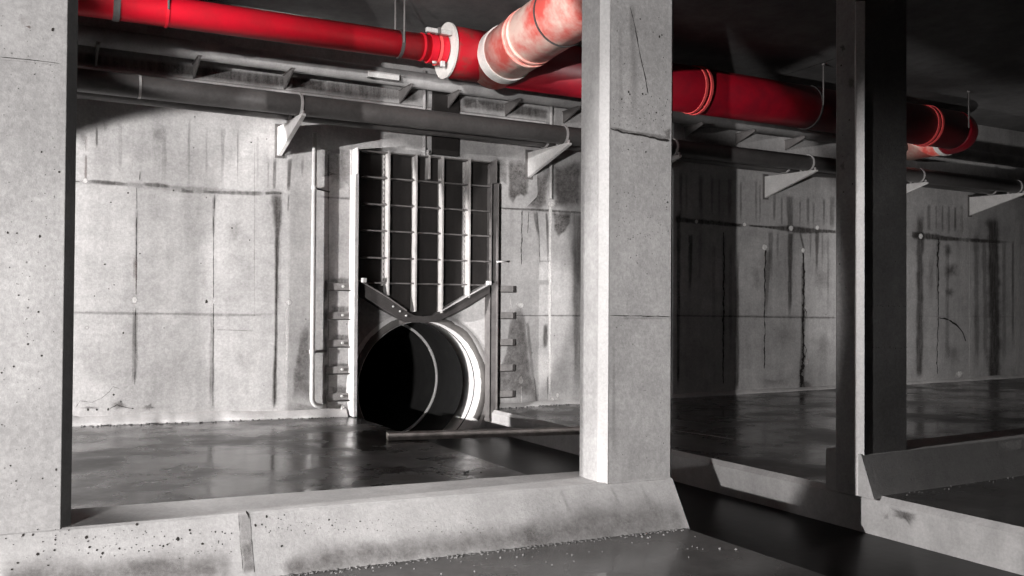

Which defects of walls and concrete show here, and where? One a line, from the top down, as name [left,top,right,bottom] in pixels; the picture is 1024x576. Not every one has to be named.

crack [630,8,648,92]
crack [610,128,669,142]
leakage [499,163,580,403]
leakage [676,215,835,380]
crack [799,253,807,387]
crack [936,238,966,374]
leakage [913,221,1000,376]